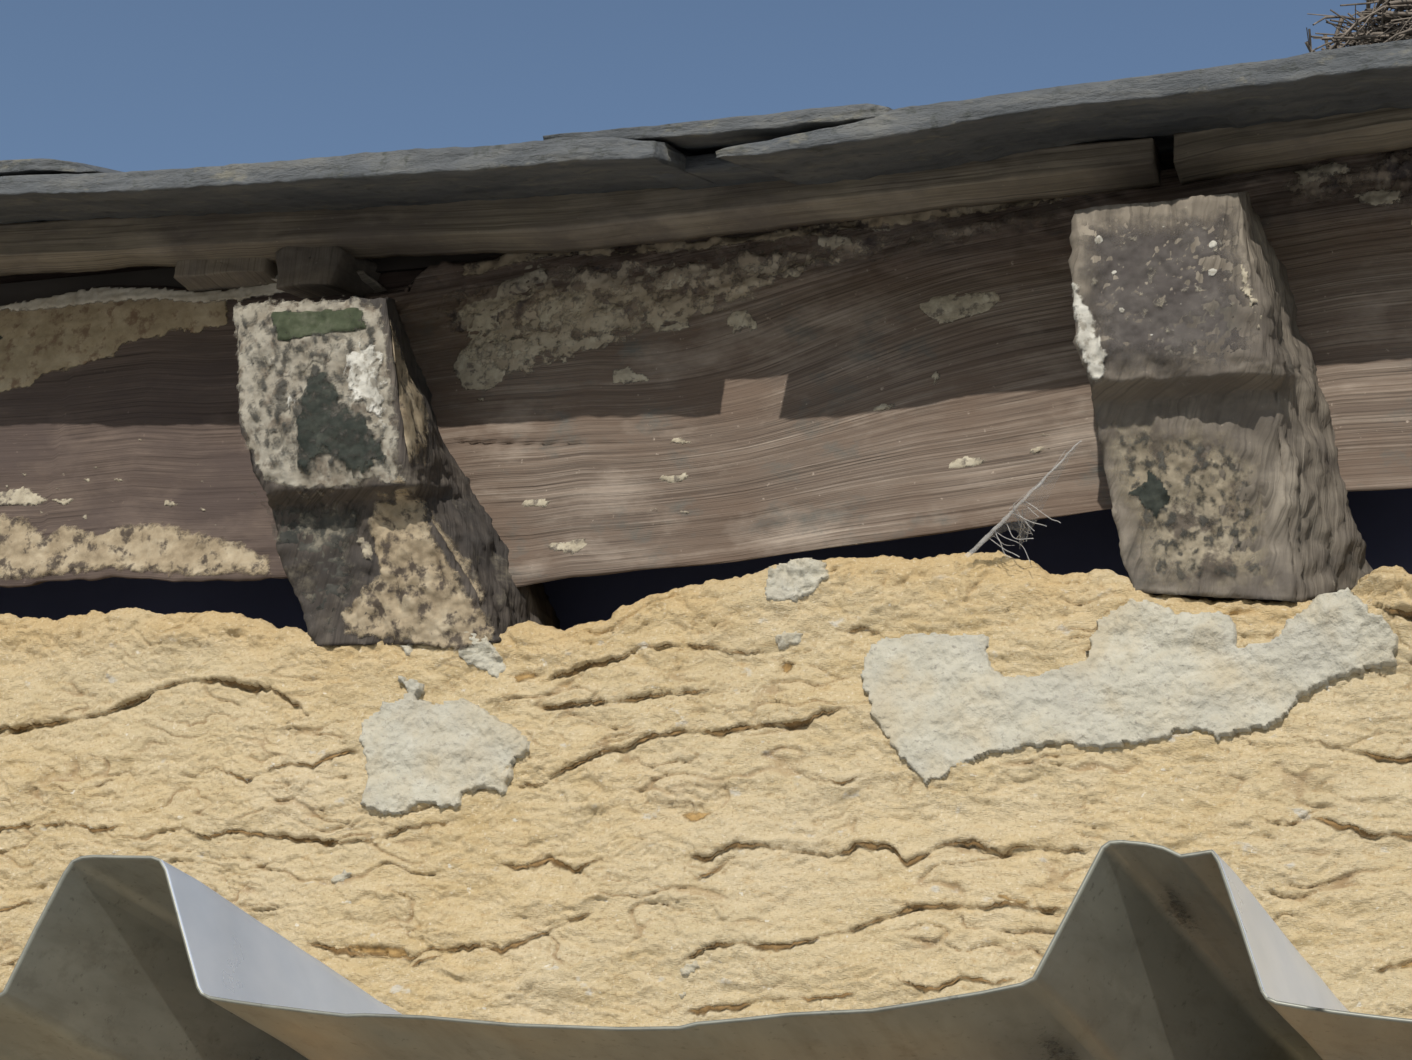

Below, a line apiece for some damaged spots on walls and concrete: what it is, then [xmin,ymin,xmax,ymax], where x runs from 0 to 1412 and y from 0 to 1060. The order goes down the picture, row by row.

leakage [241,308,390,478]
leakage [1120,432,1260,579]
leakage [273,503,359,624]
crack [545,644,754,710]
crack [0,678,299,732]
crack [522,710,832,786]
crack [200,823,432,847]
crack [511,856,597,872]
crack [842,841,1028,866]
crack [1318,817,1412,839]
crack [313,913,589,966]
crack [690,937,817,958]